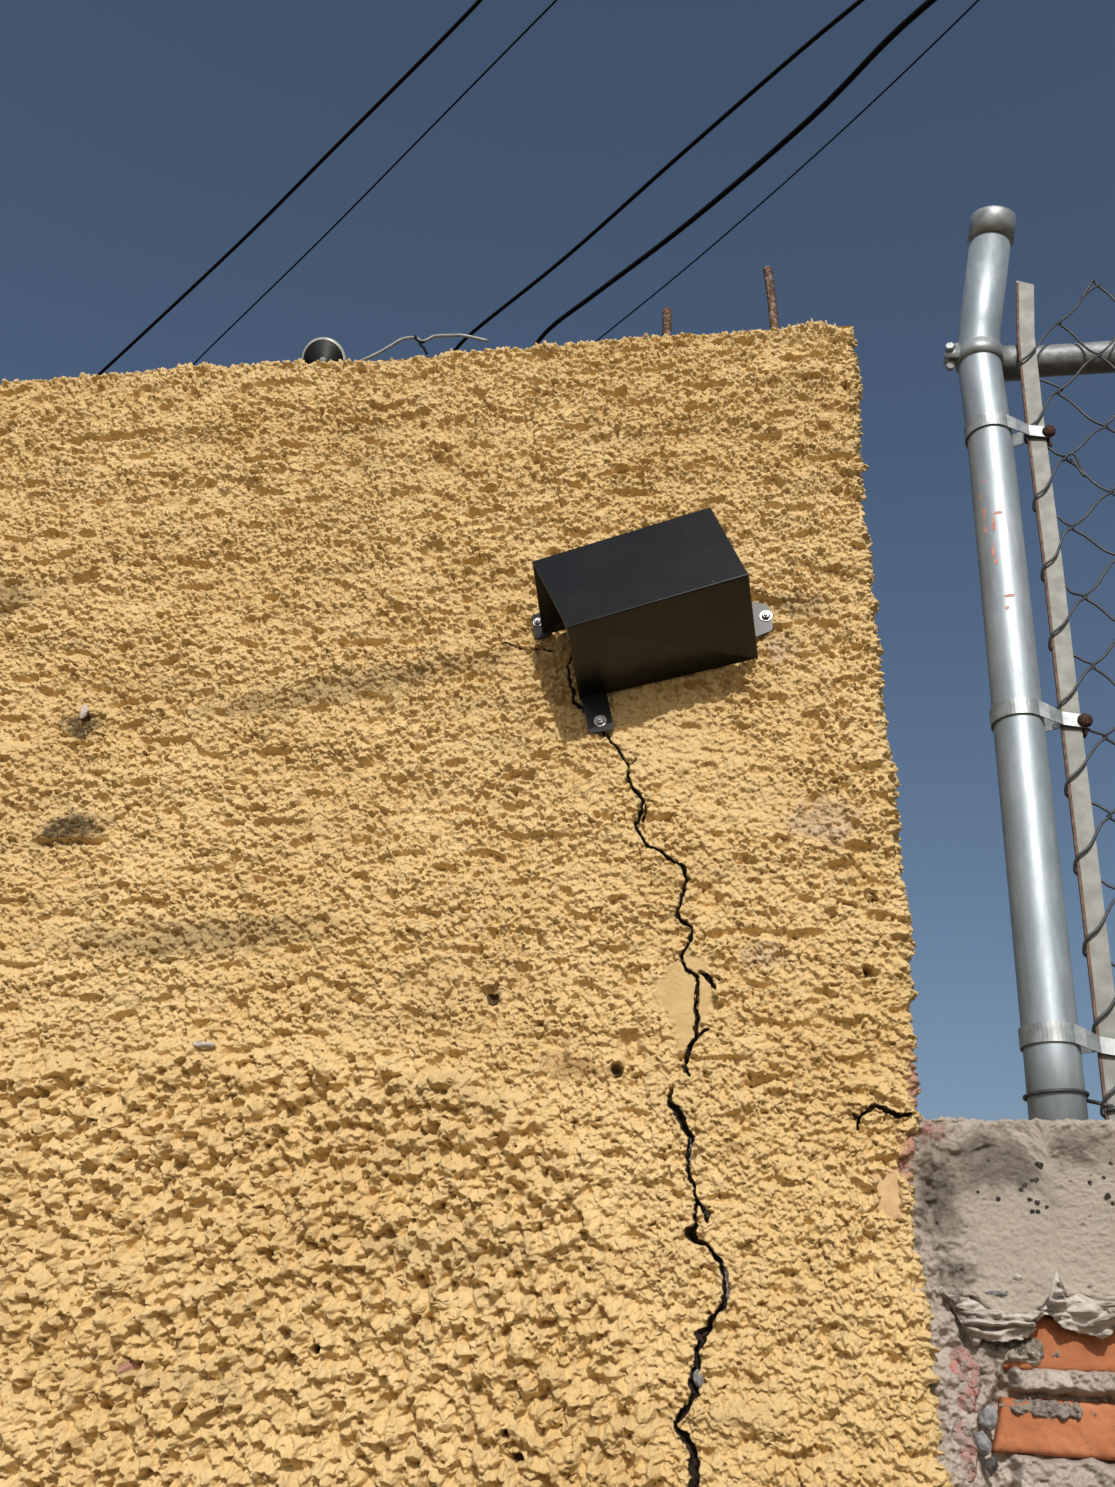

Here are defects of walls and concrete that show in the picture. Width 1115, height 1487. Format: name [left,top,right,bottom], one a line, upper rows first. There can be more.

crack [501,642,730,1487]
crack [853,1105,912,1131]